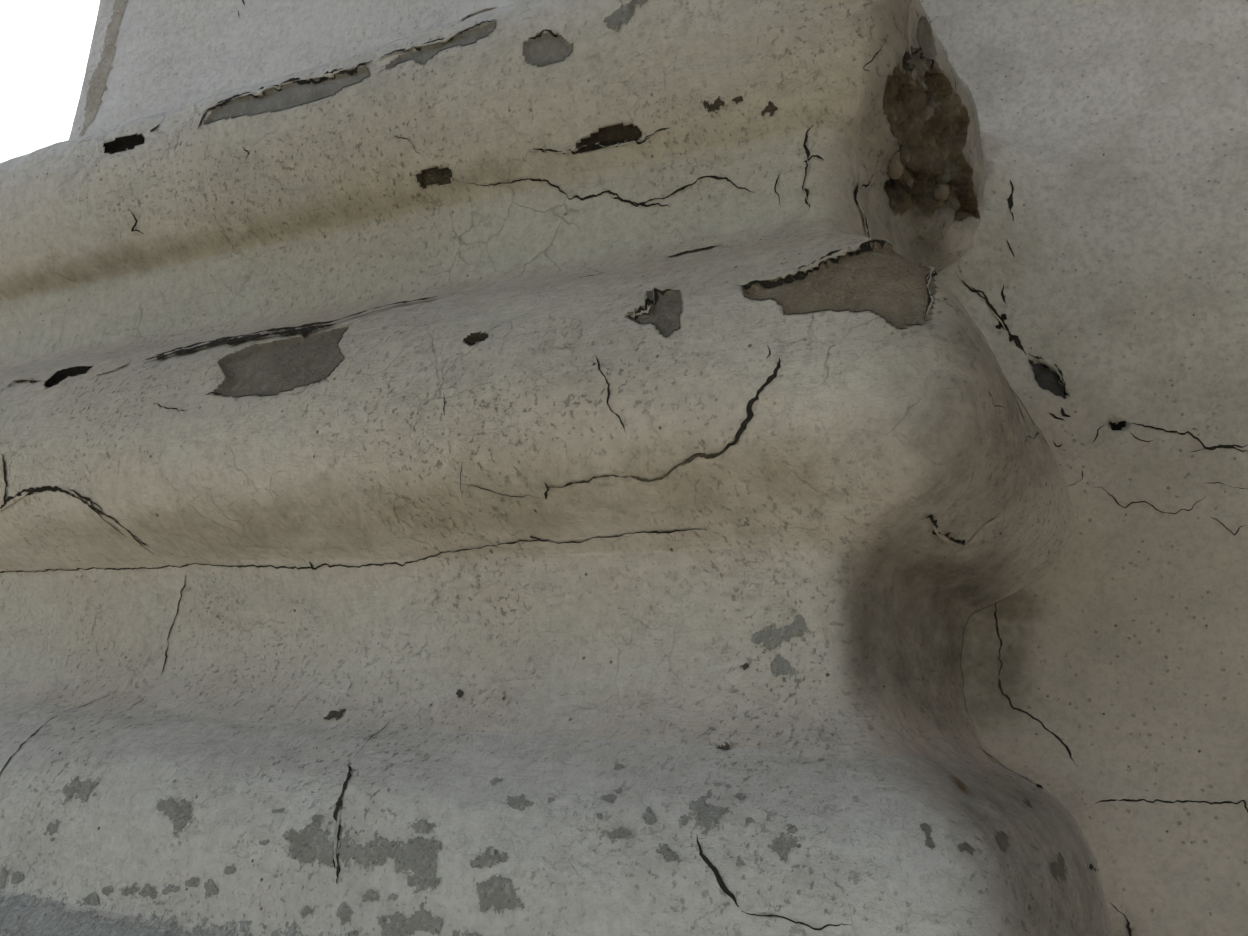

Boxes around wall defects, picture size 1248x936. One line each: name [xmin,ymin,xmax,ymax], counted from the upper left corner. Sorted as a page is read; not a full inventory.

spalling [198,7,497,128]
crack [469,125,823,207]
spalling [883,16,980,222]
spalling [6,363,131,388]
spalling [145,296,437,397]
crack [460,345,781,500]
spalling [624,286,682,337]
spalling [738,238,938,329]
crack [1024,407,1248,536]
crack [0,454,707,675]
crack [994,602,1078,767]
crack [1096,799,1248,813]